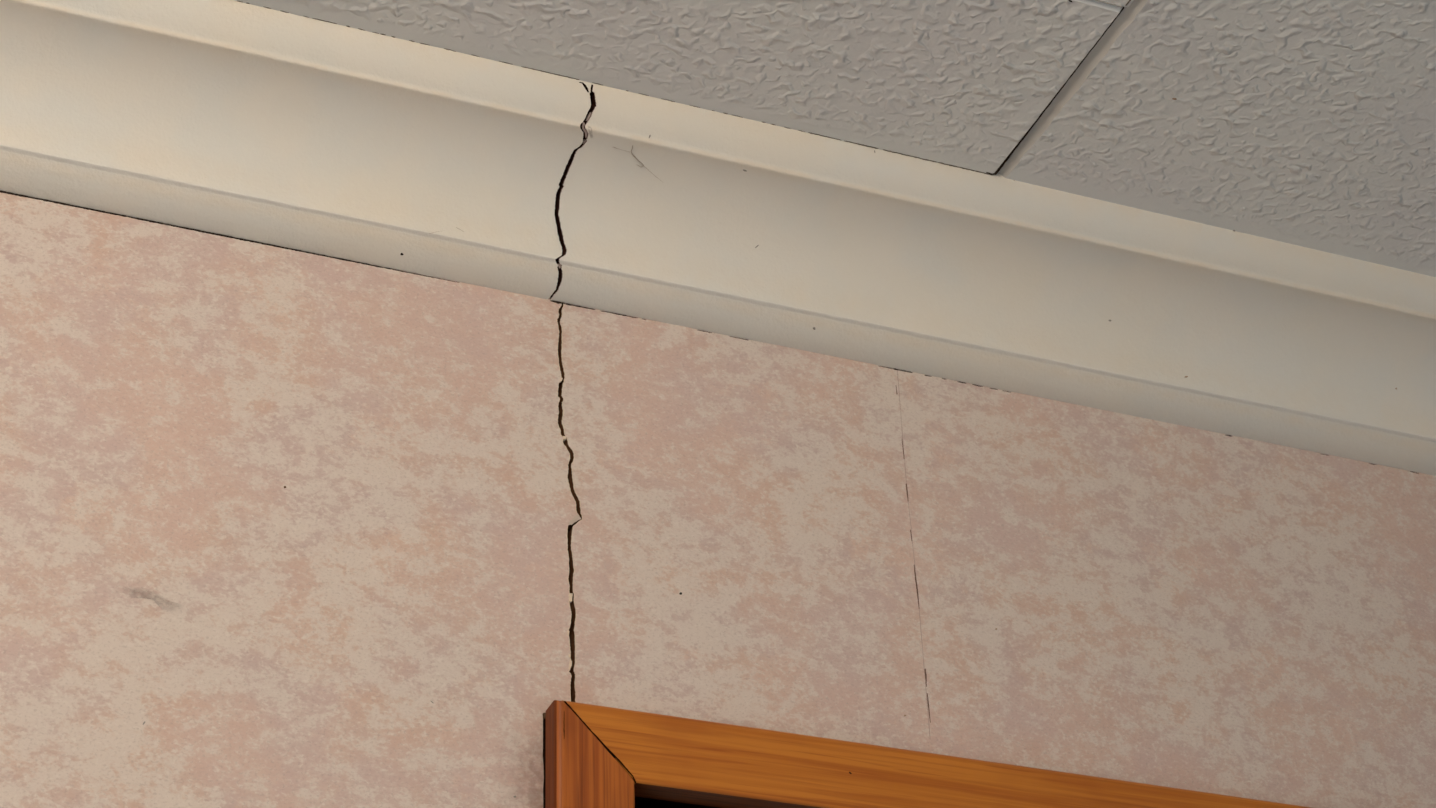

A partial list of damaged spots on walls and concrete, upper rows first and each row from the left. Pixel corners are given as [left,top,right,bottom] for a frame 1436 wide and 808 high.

crack [239,0,1131,808]